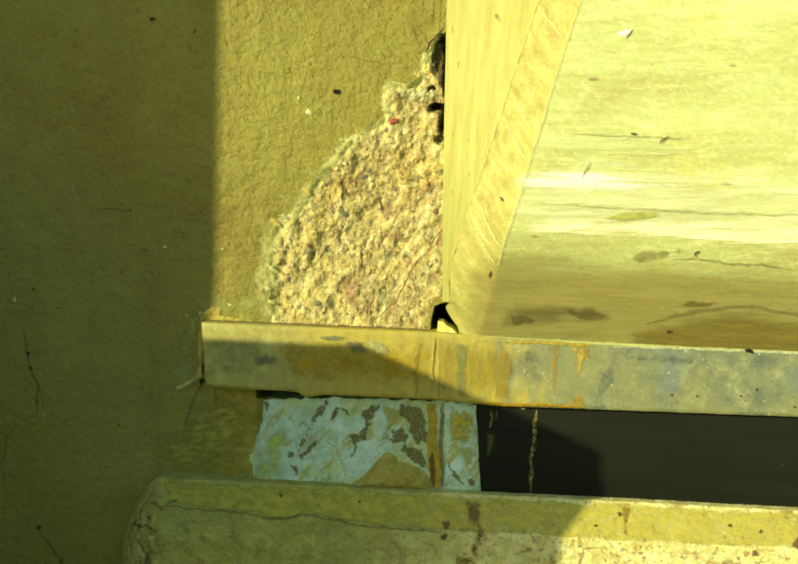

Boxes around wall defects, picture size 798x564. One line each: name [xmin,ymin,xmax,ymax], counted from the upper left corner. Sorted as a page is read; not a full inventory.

spalling [255,31,458,333]
damp [476,263,798,351]
corrosion [502,340,589,374]
peeling [287,400,350,476]
peeling [349,405,380,458]
peeling [390,404,427,467]
corrosion [478,394,583,409]